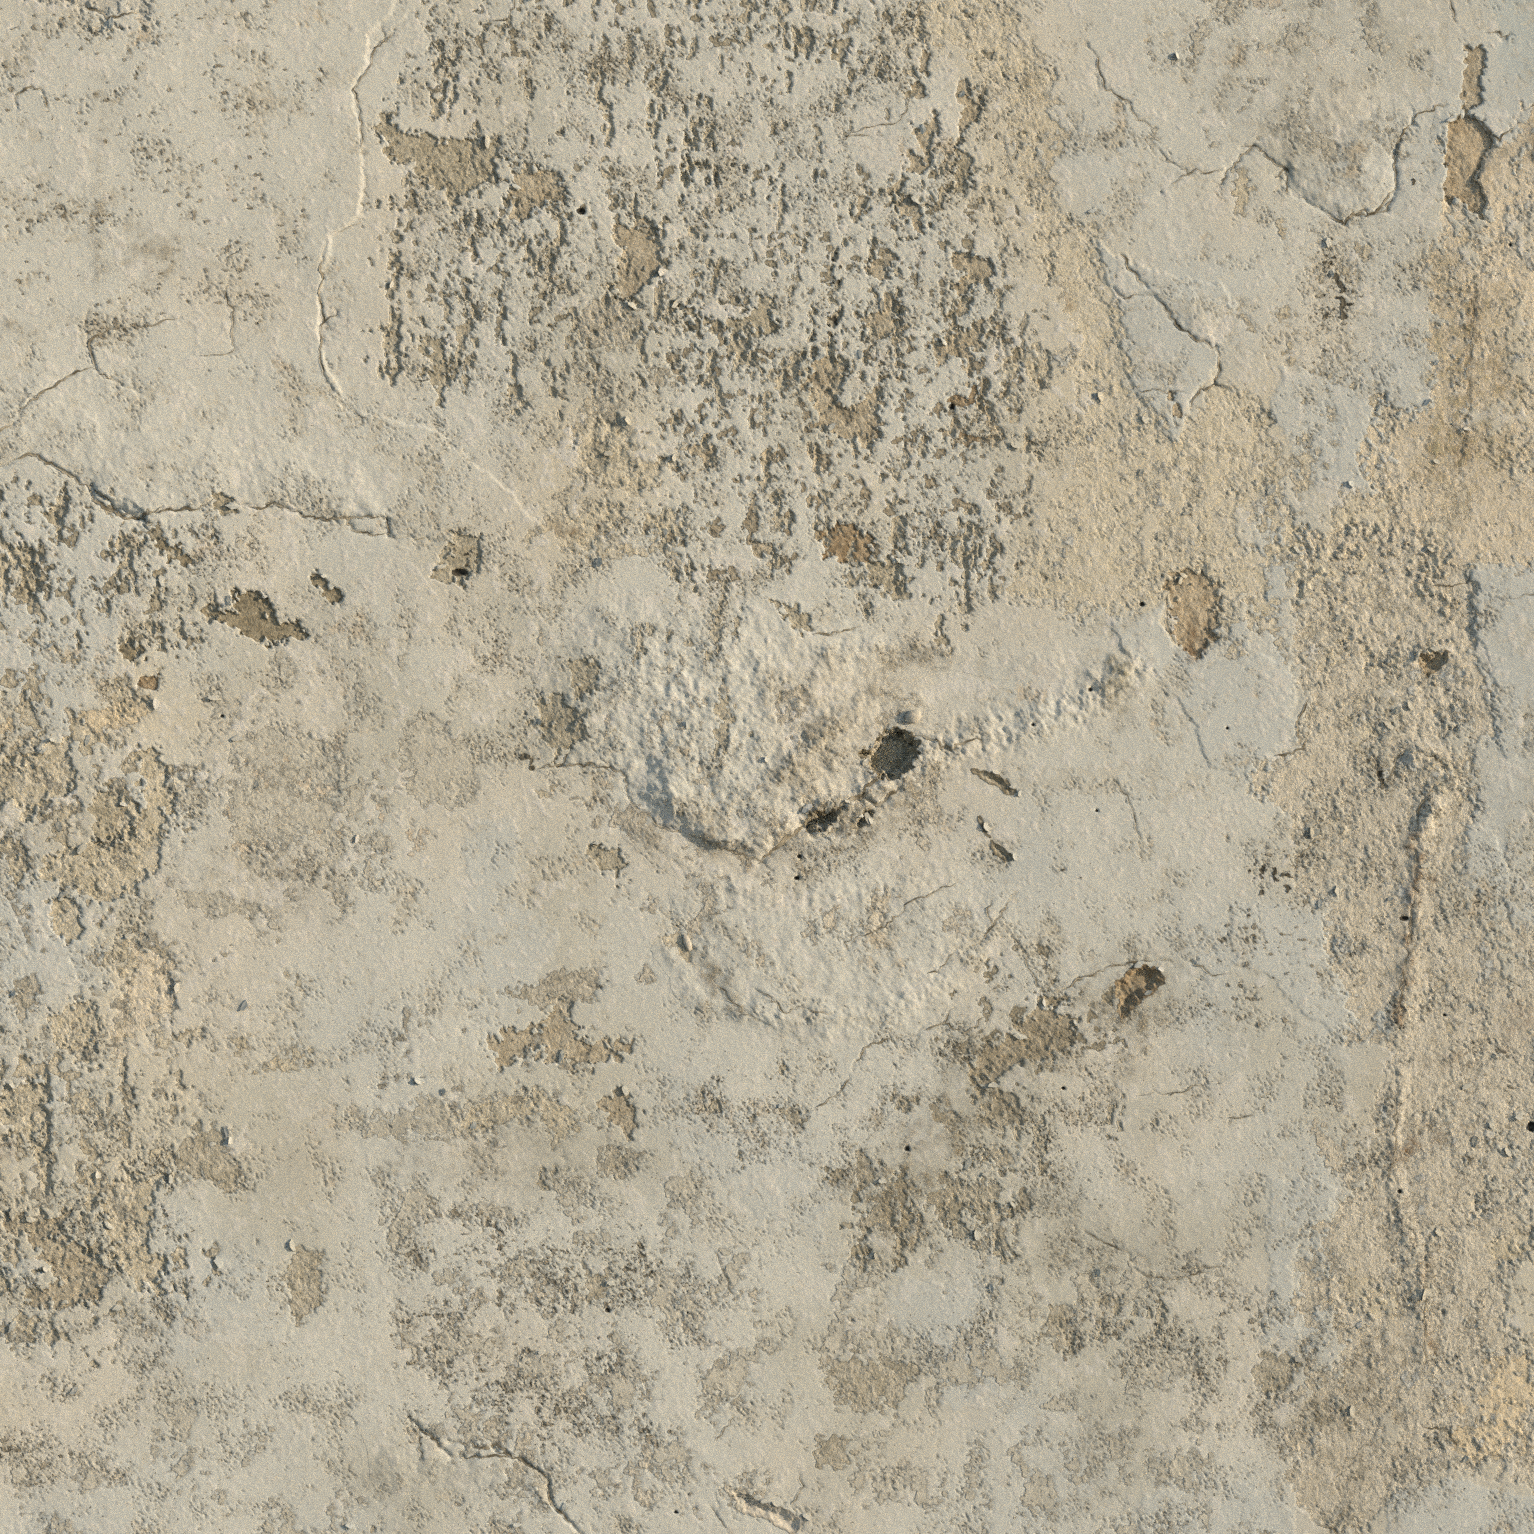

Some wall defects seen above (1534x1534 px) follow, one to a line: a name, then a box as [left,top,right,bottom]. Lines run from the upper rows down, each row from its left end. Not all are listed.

crack [1088,47,1534,225]
crack [318,27,393,418]
crack [204,252,237,356]
crack [1114,254,1229,410]
crack [0,313,431,542]
peeling [344,0,1534,1534]
crack [711,978,830,1021]
crack [833,882,958,958]
crack [927,898,1229,1000]
crack [816,1008,984,1109]
peeling [5,1441,83,1534]
peeling [325,1488,367,1534]